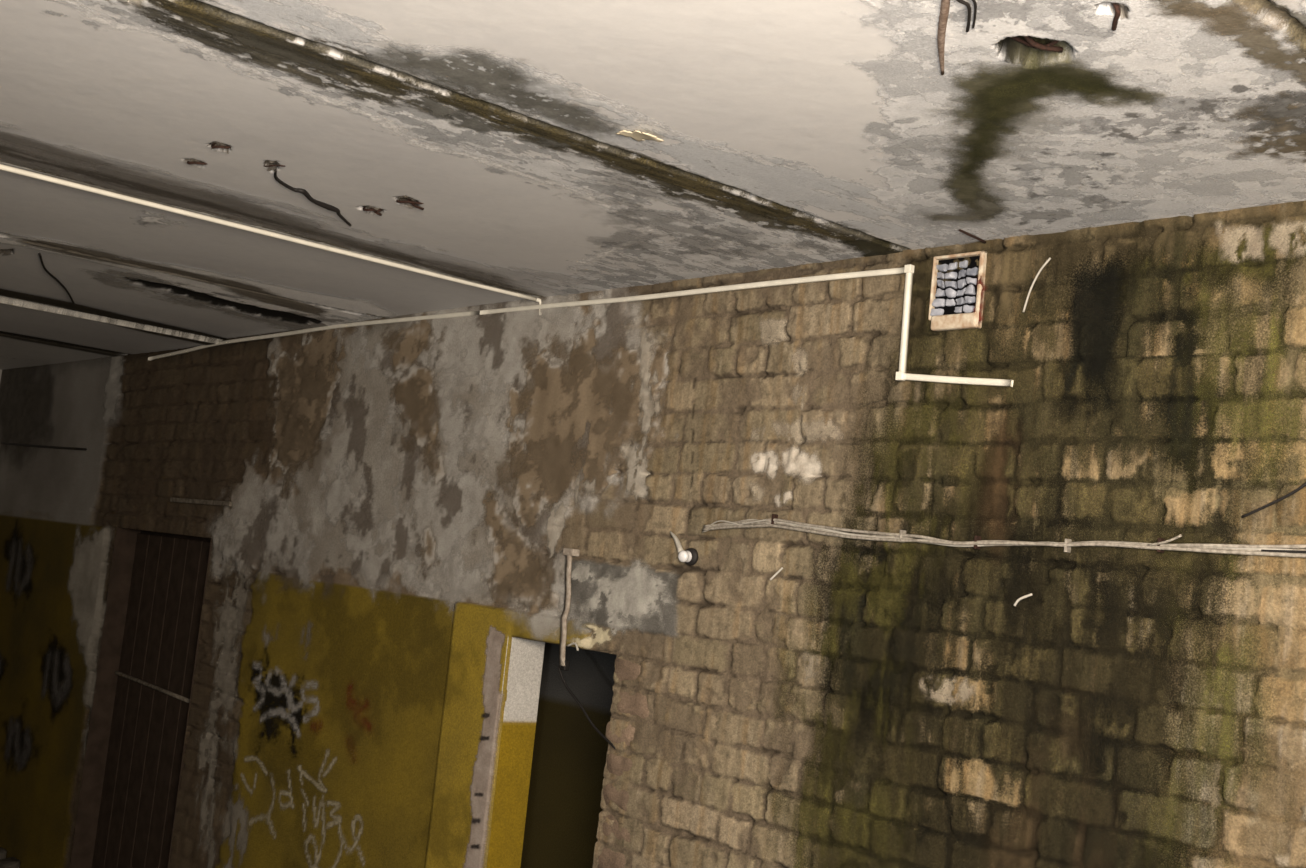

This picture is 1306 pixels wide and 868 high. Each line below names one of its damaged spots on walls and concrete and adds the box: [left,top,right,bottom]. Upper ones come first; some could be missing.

leakage [137,0,855,248]
peeling [0,0,1306,296]
leakage [925,37,1164,222]
leakage [1156,0,1306,163]
peeling [0,233,446,499]
leakage [878,201,1306,487]
leakage [784,398,1268,868]